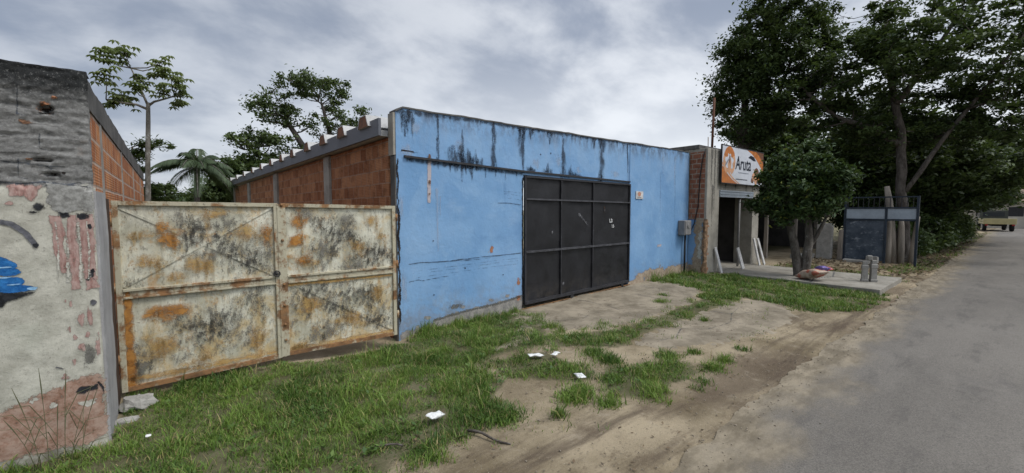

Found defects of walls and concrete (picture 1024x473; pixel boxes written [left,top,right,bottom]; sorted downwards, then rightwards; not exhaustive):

spalling [18,96,57,124]
leakage [398,110,647,182]
peeling [0,158,109,462]